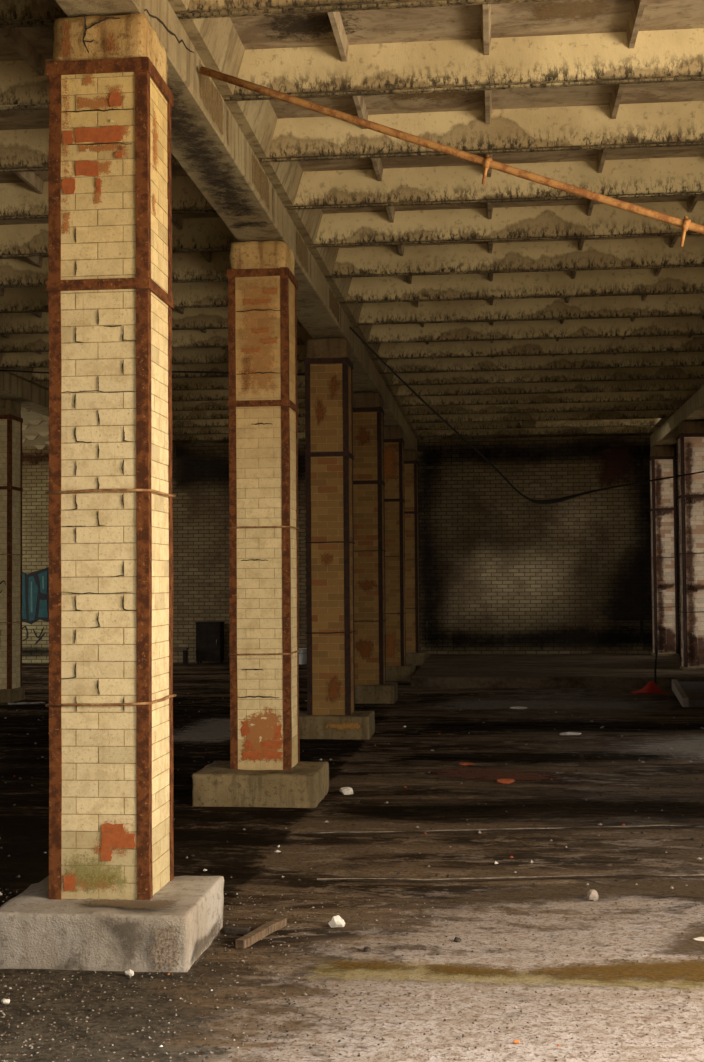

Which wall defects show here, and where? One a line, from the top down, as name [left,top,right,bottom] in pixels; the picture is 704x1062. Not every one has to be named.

crack [82,14,120,53]
crack [144,9,194,53]
peeling [61,74,130,233]
water stain [167,60,274,228]
peeling [239,707,283,762]
peeling [94,820,136,861]
peeling [63,872,116,891]